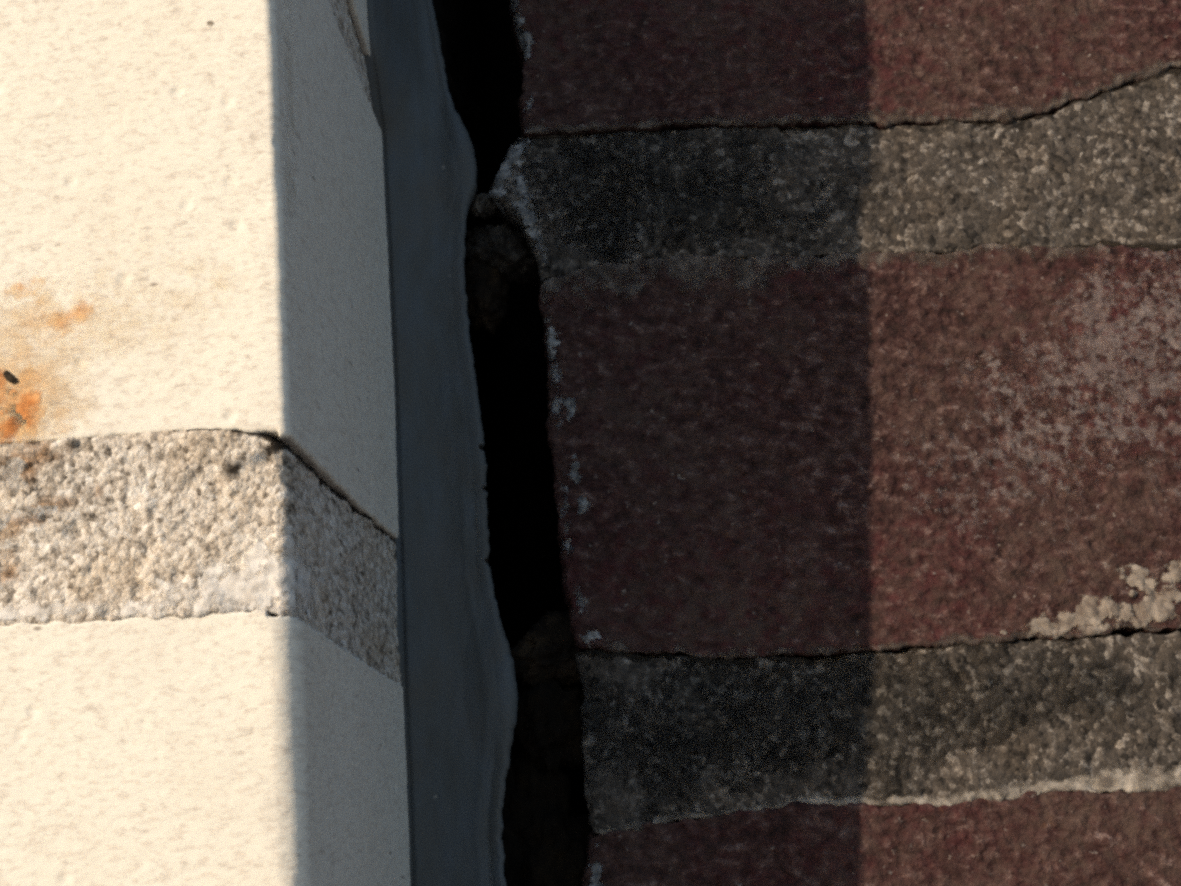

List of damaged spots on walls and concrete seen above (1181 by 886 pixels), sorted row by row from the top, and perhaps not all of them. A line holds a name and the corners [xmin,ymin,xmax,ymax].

crack [590,69,1181,136]
corrosion [0,316,70,444]
crack [576,631,1175,666]